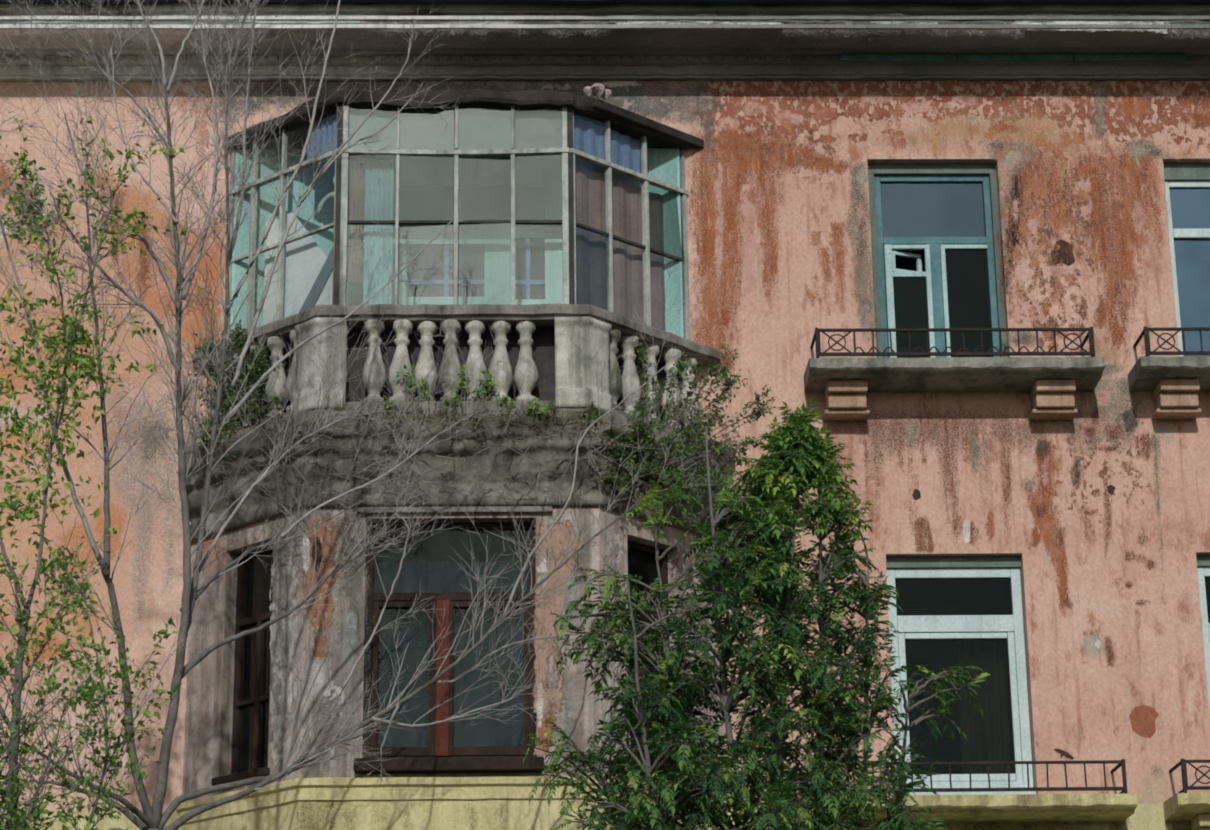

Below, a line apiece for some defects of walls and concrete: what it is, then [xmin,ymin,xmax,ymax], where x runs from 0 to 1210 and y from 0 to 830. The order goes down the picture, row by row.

water stain [844,161,881,346]
water stain [998,331,1044,347]
water stain [826,403,1057,525]
peeling [269,513,365,767]
peeling [532,519,587,757]
flaking render [1129,705,1163,738]